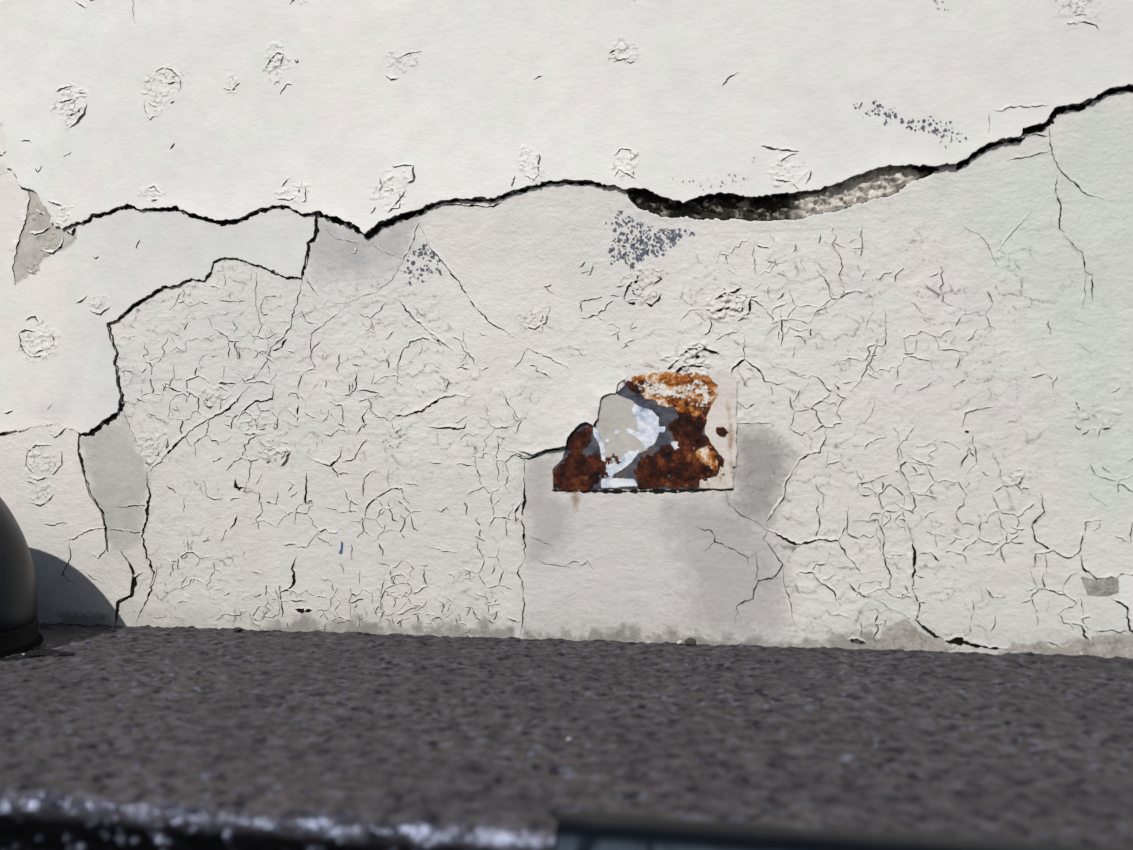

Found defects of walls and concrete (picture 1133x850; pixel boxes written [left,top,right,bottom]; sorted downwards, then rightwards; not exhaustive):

crack [1080,20,1100,29]
peeling [49,82,89,132]
peeling [366,162,415,216]
spalling [609,145,933,221]
peeling [620,265,662,307]
peeling [0,123,317,627]
peeling [513,366,628,454]
crack [43,85,1133,650]
rust [552,371,731,500]
peeling [658,339,737,467]
spalling [1081,577,1119,597]
spalling [999,634,1133,659]